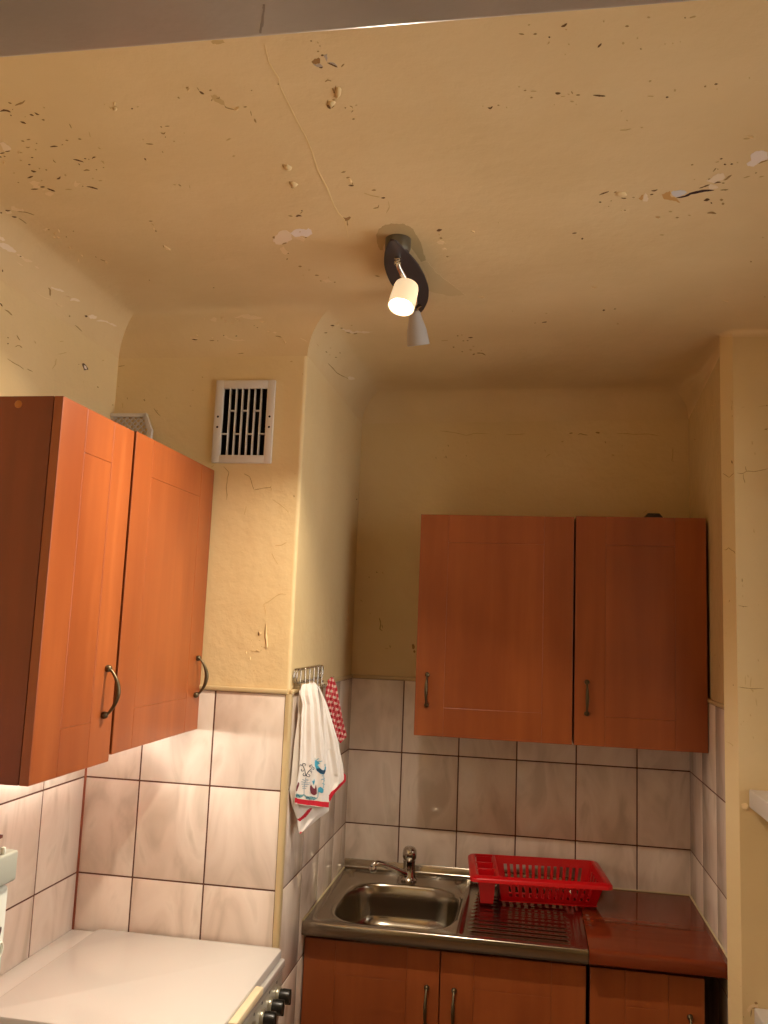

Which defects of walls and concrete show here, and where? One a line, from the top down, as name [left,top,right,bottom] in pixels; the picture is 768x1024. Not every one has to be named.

peeling [694,150,768,205]
peeling [273,228,312,267]